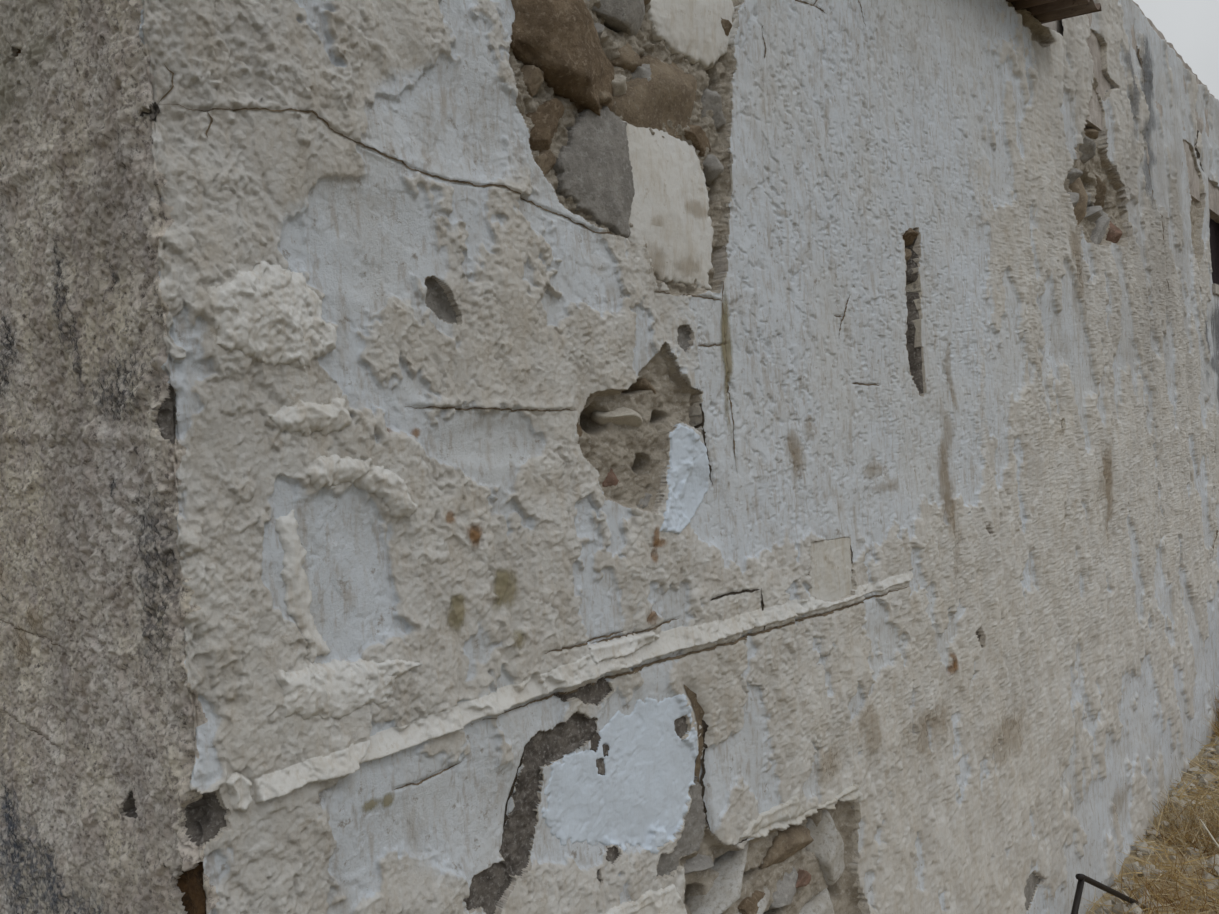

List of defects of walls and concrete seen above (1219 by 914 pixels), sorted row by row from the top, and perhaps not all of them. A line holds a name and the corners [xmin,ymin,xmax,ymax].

crack [157,64,613,235]
spalling [509,0,743,296]
spalling [1064,128,1128,247]
spalling [902,228,924,396]
crack [405,405,574,413]
spalling [577,325,710,535]
spalling [177,861,206,914]
spalling [185,772,252,846]
crack [394,762,461,790]
peeling [463,677,612,914]
crack [483,586,909,829]
spalling [605,775,864,914]